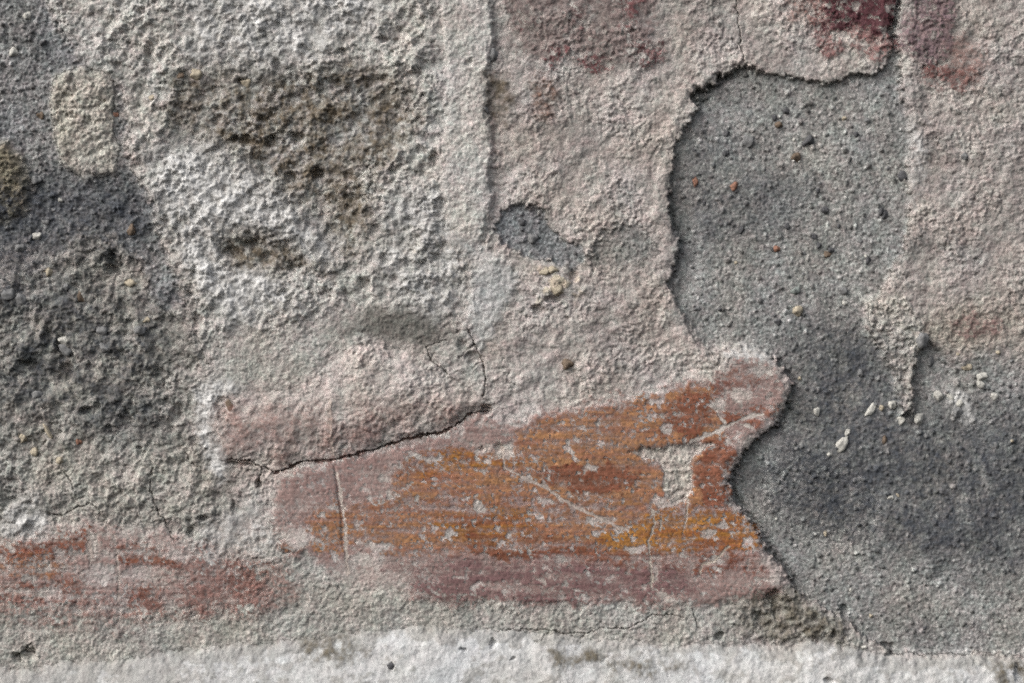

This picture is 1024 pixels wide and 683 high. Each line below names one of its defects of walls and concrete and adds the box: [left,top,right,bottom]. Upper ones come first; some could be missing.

crack [225,410,489,488]
spalling [272,0,1024,657]